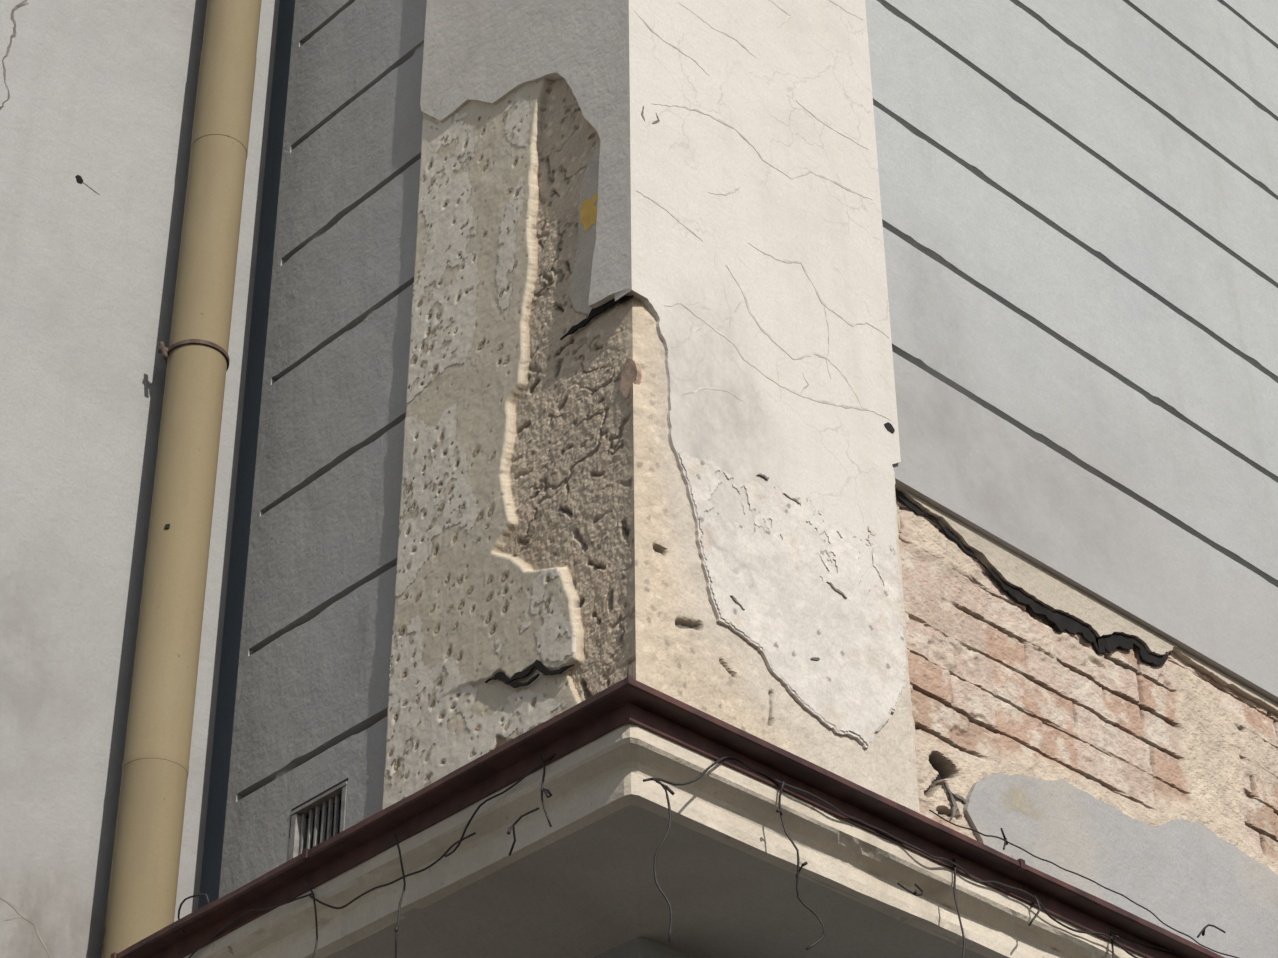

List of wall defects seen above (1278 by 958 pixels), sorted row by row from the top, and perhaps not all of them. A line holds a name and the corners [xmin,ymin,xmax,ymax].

crack [0,0,28,110]
flaking render [382,78,1278,958]
crack [895,488,1171,666]
crack [485,659,574,688]